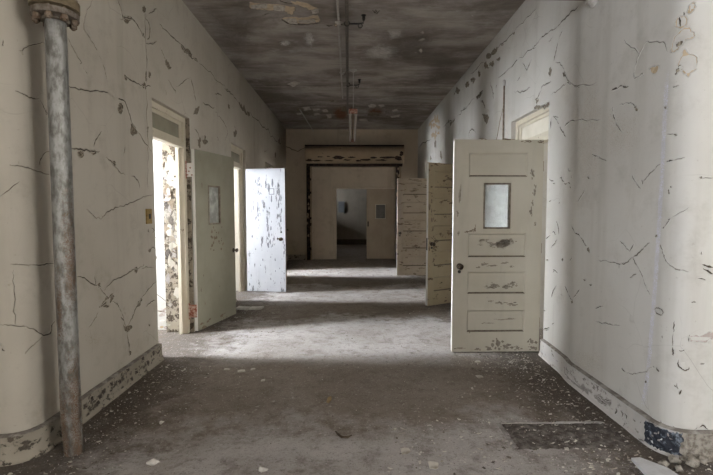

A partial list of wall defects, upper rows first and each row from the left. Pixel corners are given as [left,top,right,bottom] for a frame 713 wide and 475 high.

peeling [249,0,343,27]
crack [444,5,668,137]
peeling [670,2,699,78]
crack [69,0,305,220]
crack [0,151,50,196]
crack [632,157,685,189]
crack [546,207,713,295]
crack [0,262,56,354]
crack [77,237,164,356]
crack [661,321,676,356]
spalling [497,421,636,449]
flaking render [644,421,684,456]